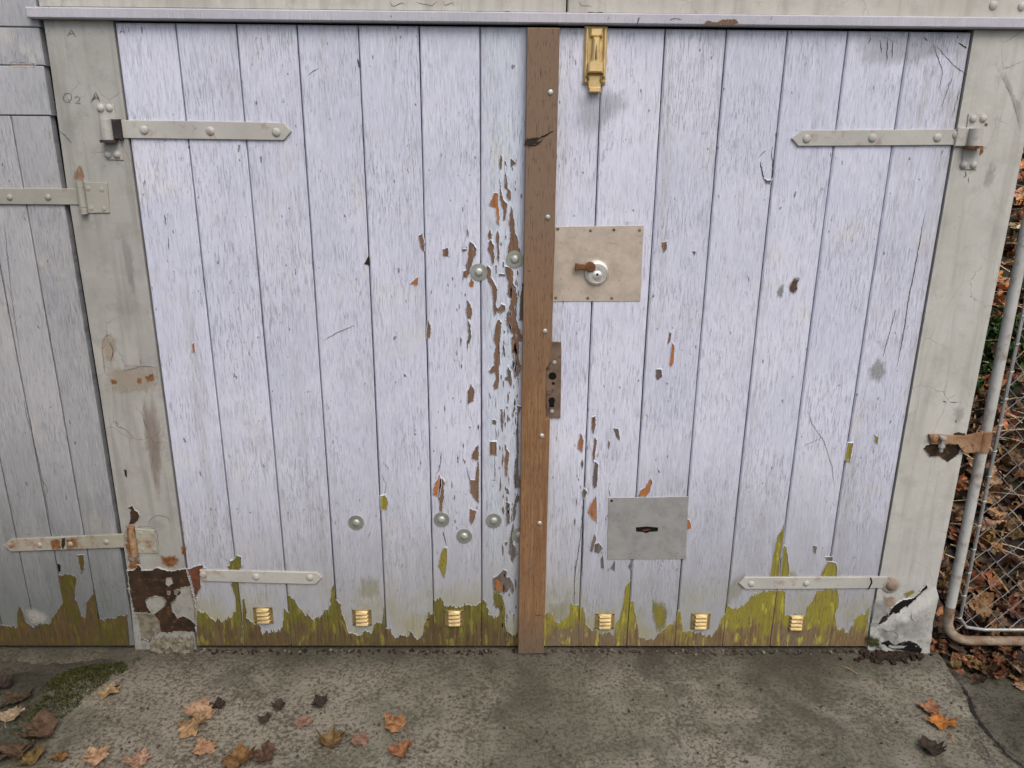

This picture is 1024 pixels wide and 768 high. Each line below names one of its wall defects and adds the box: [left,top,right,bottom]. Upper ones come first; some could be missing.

peeling [655,331,675,381]
peeling [196,153,523,646]
corrosion [923,432,965,462]
corrosion [51,538,77,549]
peeling [544,415,870,646]
spalling [881,640,922,653]